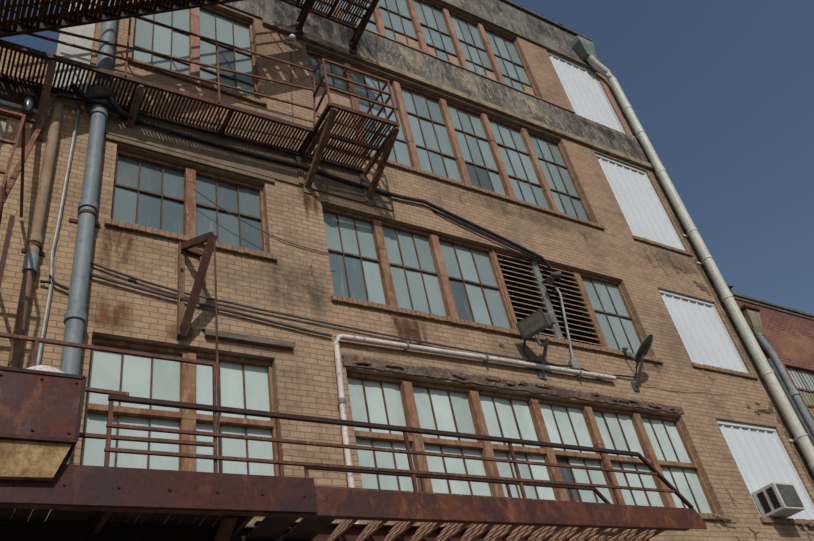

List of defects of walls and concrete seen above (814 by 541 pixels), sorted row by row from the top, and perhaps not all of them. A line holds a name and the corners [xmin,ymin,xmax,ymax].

spalling [746,401,791,439]